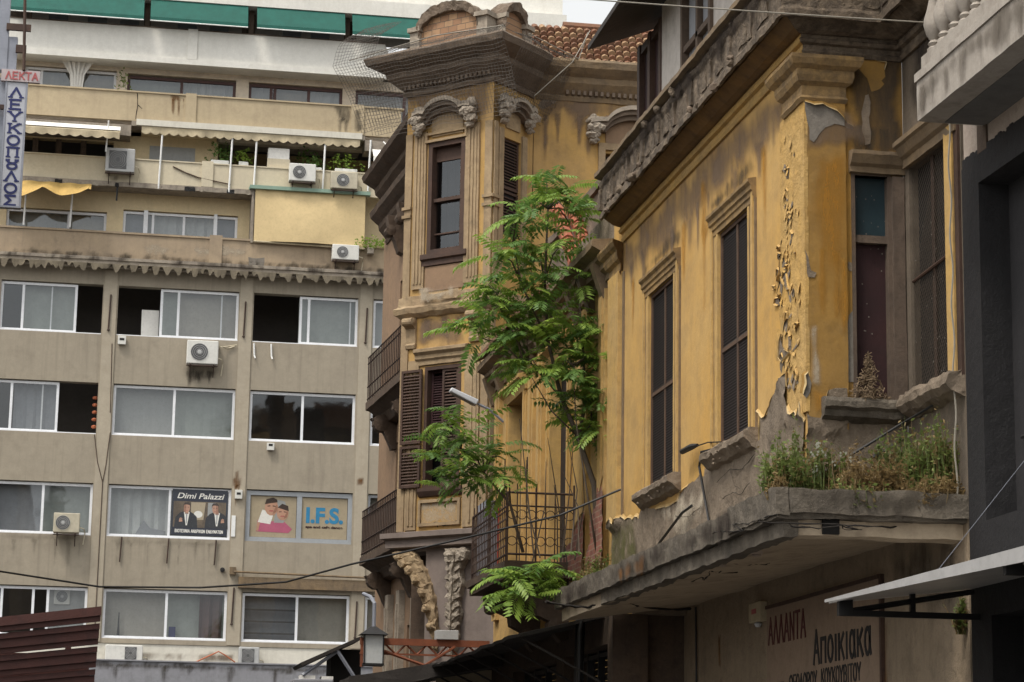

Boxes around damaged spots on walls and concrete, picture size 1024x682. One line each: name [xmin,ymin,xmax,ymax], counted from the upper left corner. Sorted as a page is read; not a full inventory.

damp [498,92,637,150]
damp [626,103,781,275]
flaking render [805,60,887,145]
flaking render [562,135,908,581]